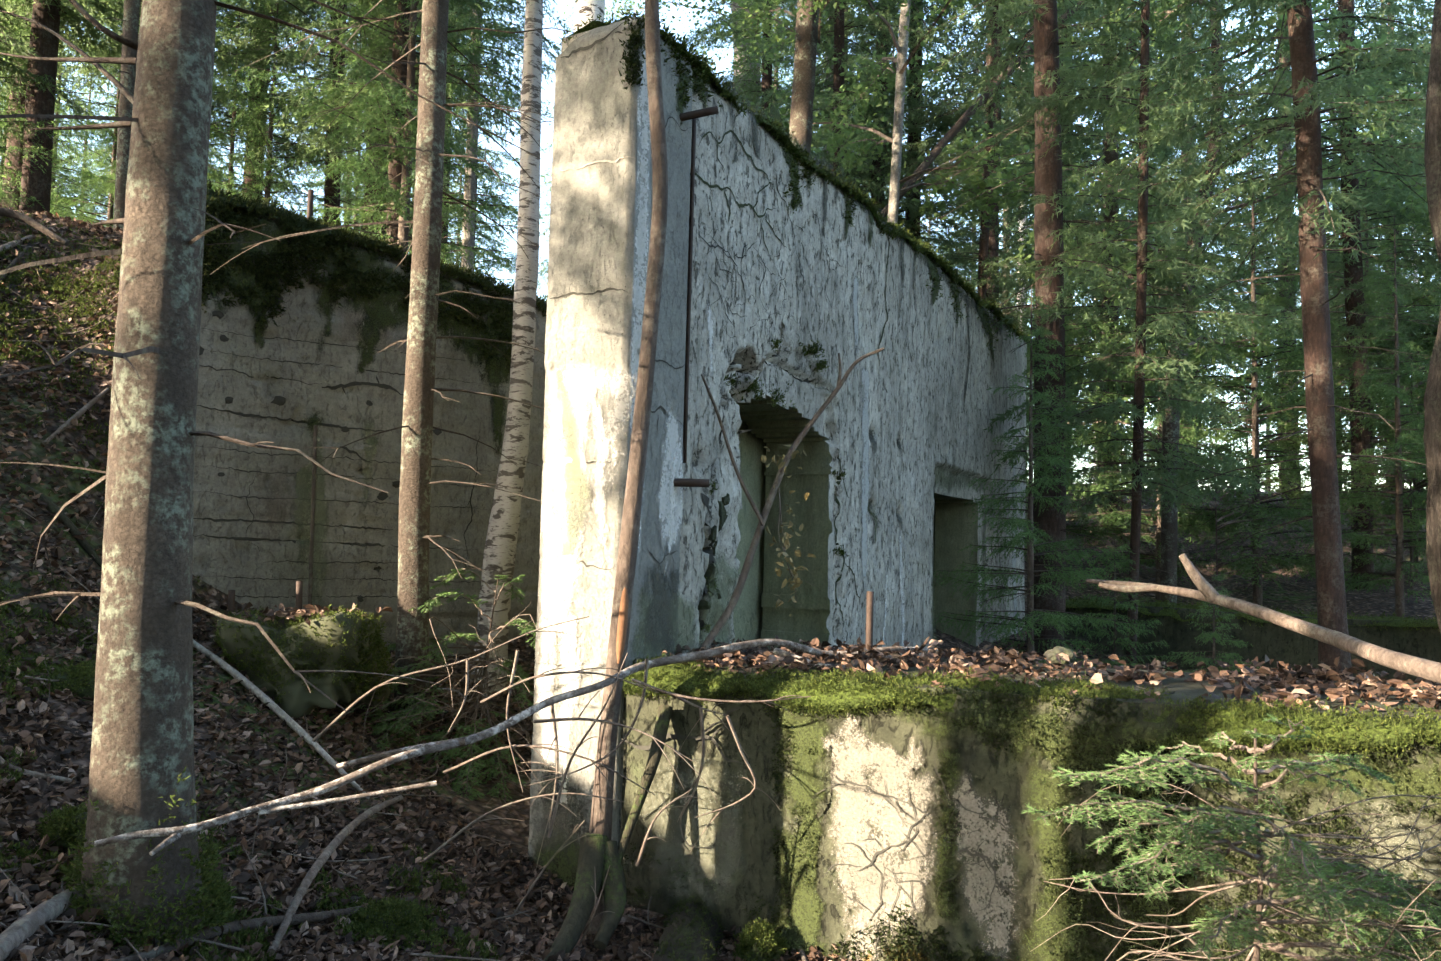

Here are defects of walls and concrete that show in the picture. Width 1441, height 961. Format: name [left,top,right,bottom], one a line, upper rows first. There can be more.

water stain [240,285,268,348]
water stain [316,277,339,336]
water stain [357,315,383,373]
crack [549,287,628,299]
crack [665,114,954,426]
crack [651,405,682,431]
crack [647,493,718,631]
water stain [774,713,828,957]
water stain [933,746,963,920]